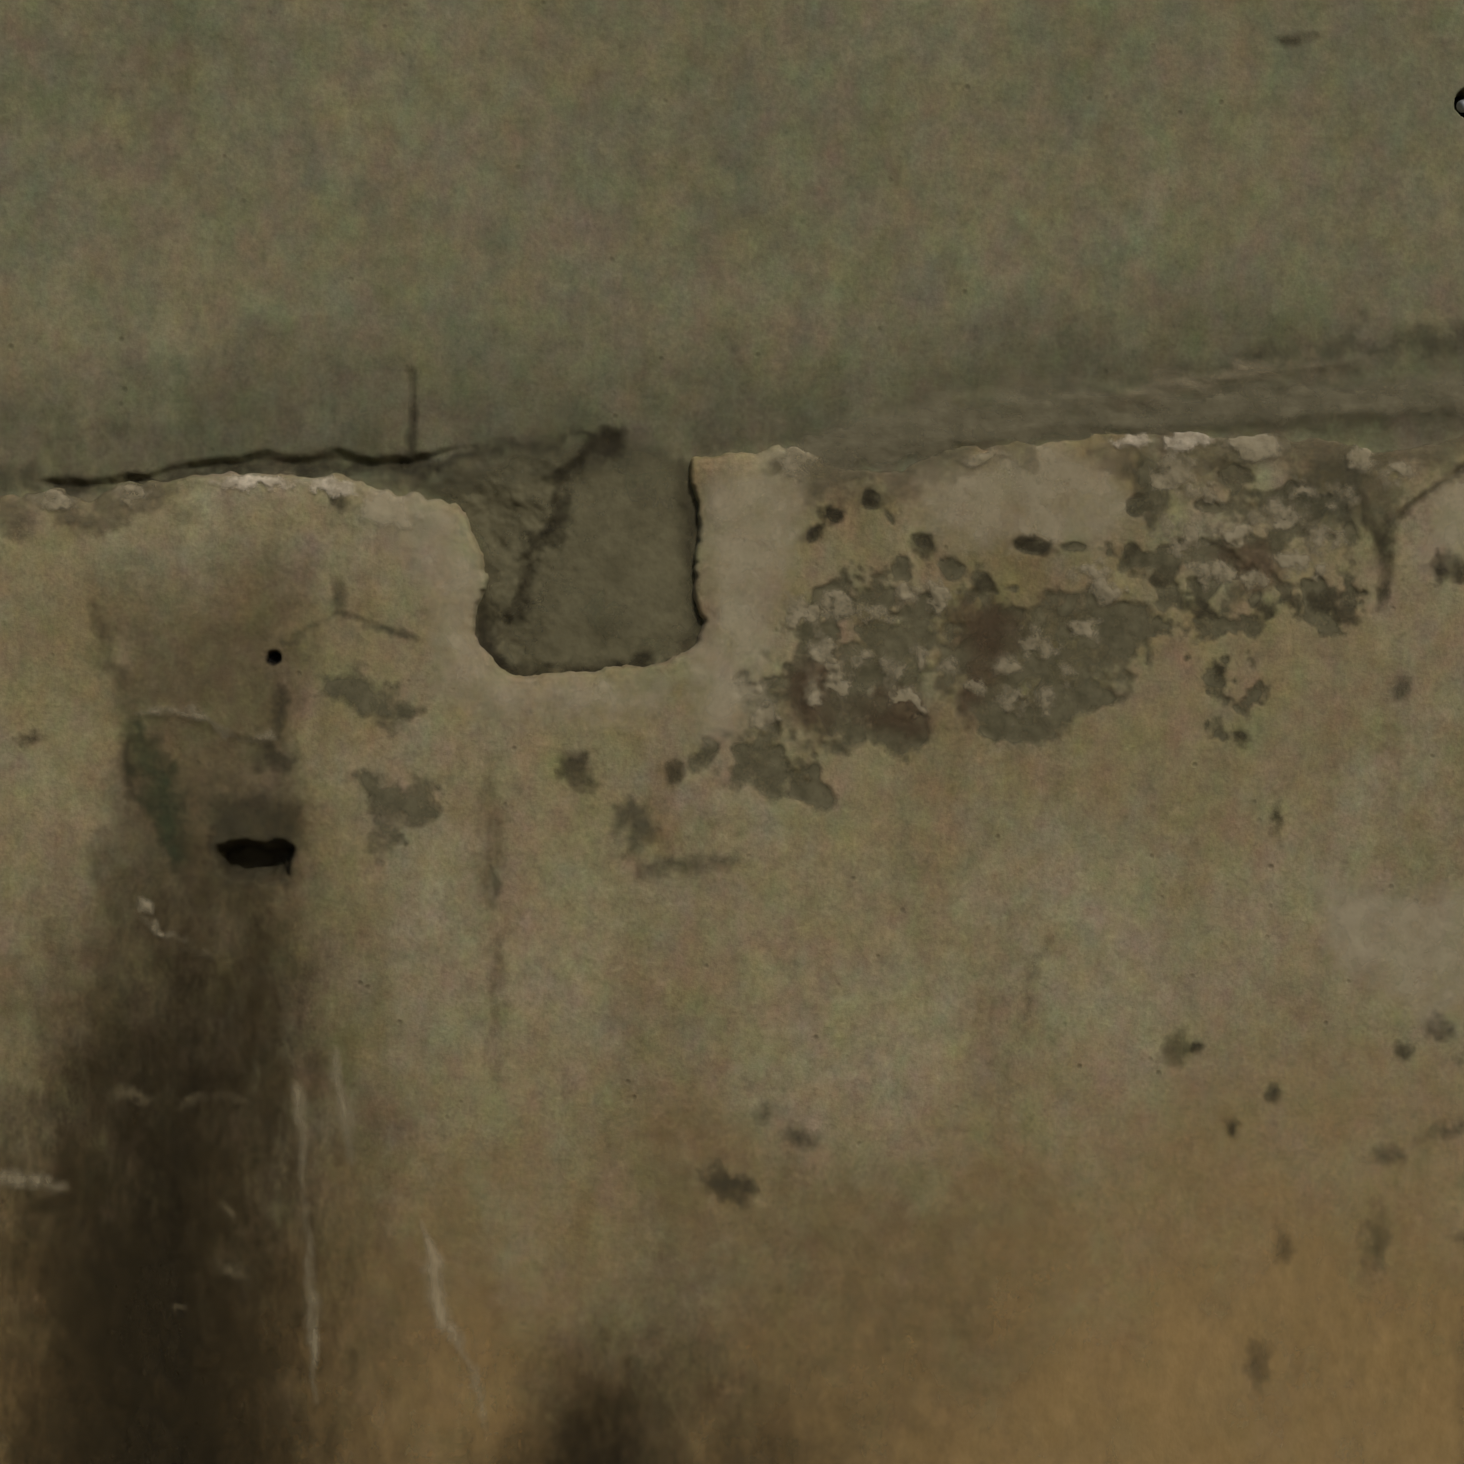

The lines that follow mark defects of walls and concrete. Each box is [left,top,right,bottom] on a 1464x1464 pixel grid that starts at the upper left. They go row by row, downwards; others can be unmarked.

crack [127,403,520,483]
crack [54,483,92,494]
spalling [430,429,700,676]
peeling [667,431,1414,810]
peeling [324,675,424,724]
peeling [353,771,440,845]
water stain [49,899,329,1464]